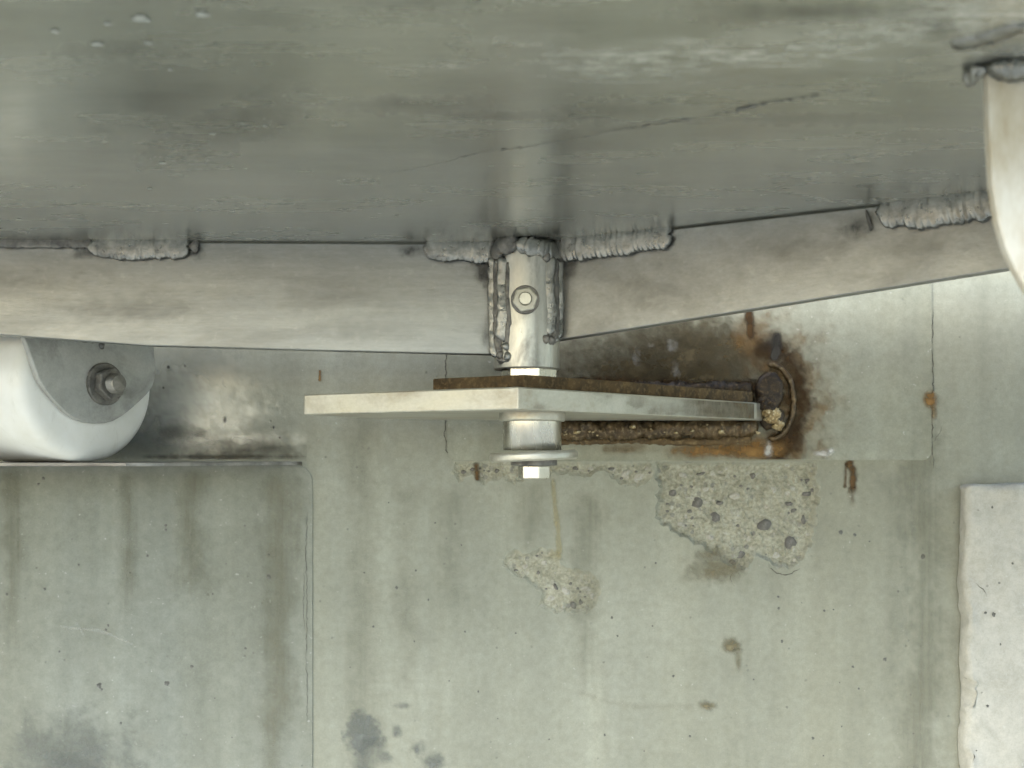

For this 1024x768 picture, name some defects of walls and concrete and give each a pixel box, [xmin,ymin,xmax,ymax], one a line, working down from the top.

corrosion [557,312,814,460]
corrosion [924,392,936,414]
spalling [450,461,536,486]
corrosion [843,460,857,491]
spalling [550,447,833,572]
spalling [499,547,601,614]
leakage [343,713,380,768]